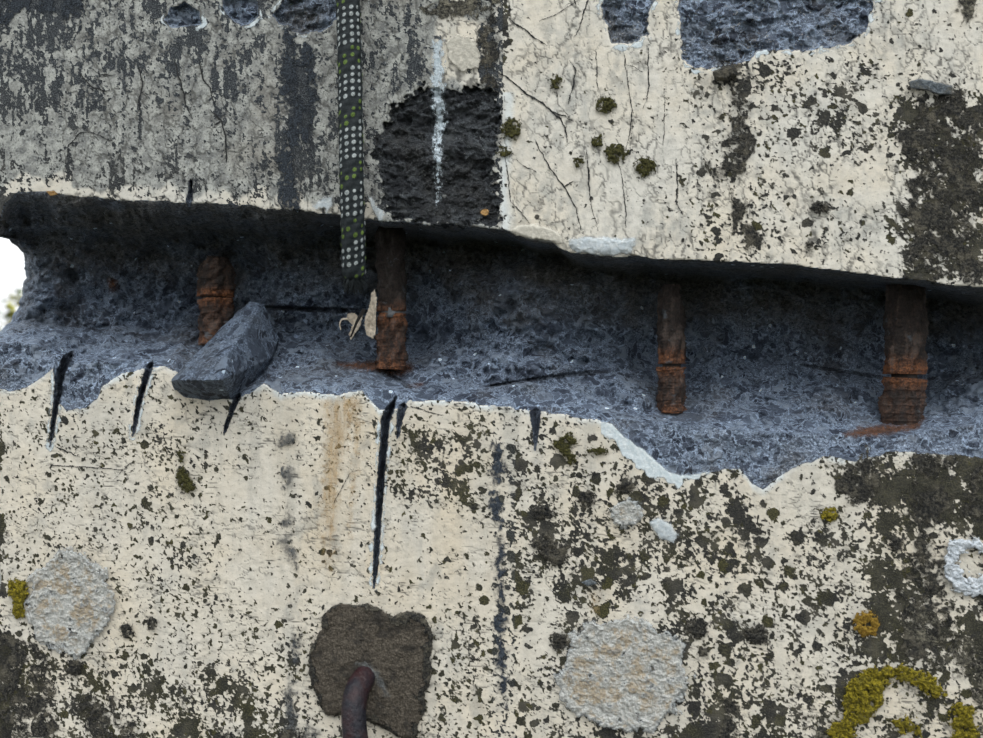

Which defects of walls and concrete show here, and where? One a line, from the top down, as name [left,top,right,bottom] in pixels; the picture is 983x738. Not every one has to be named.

peeling [445,34,480,72]
spalling [597,0,658,52]
spalling [676,0,882,74]
spalling [369,81,507,229]
peeling [313,197,332,215]
spalling [0,343,105,411]
spalling [601,416,983,489]